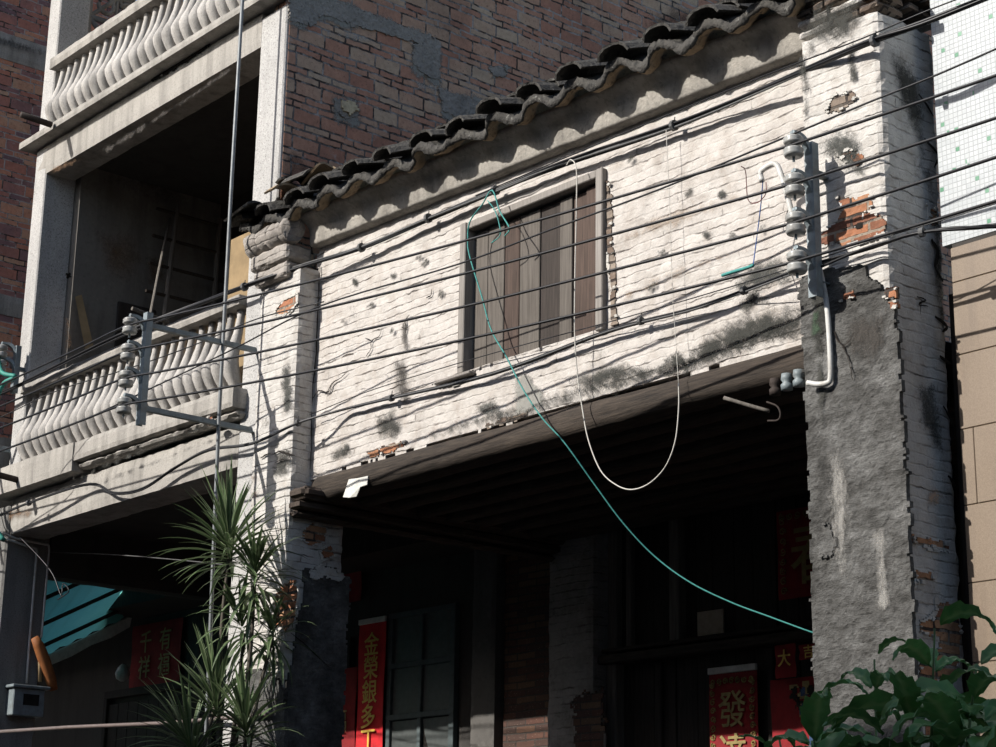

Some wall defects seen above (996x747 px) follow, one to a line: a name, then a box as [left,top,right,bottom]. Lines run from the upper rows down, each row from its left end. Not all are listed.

spalling [823,91,858,114]
damp [893,53,924,147]
spalling [835,147,865,166]
spalling [821,194,887,246]
damp [934,233,944,320]
damp [449,259,826,433]
spalling [367,440,407,458]
damp [918,383,942,449]
peeling [302,523,345,582]
peeling [272,579,301,678]
peeling [919,598,964,681]
peeling [570,687,609,747]